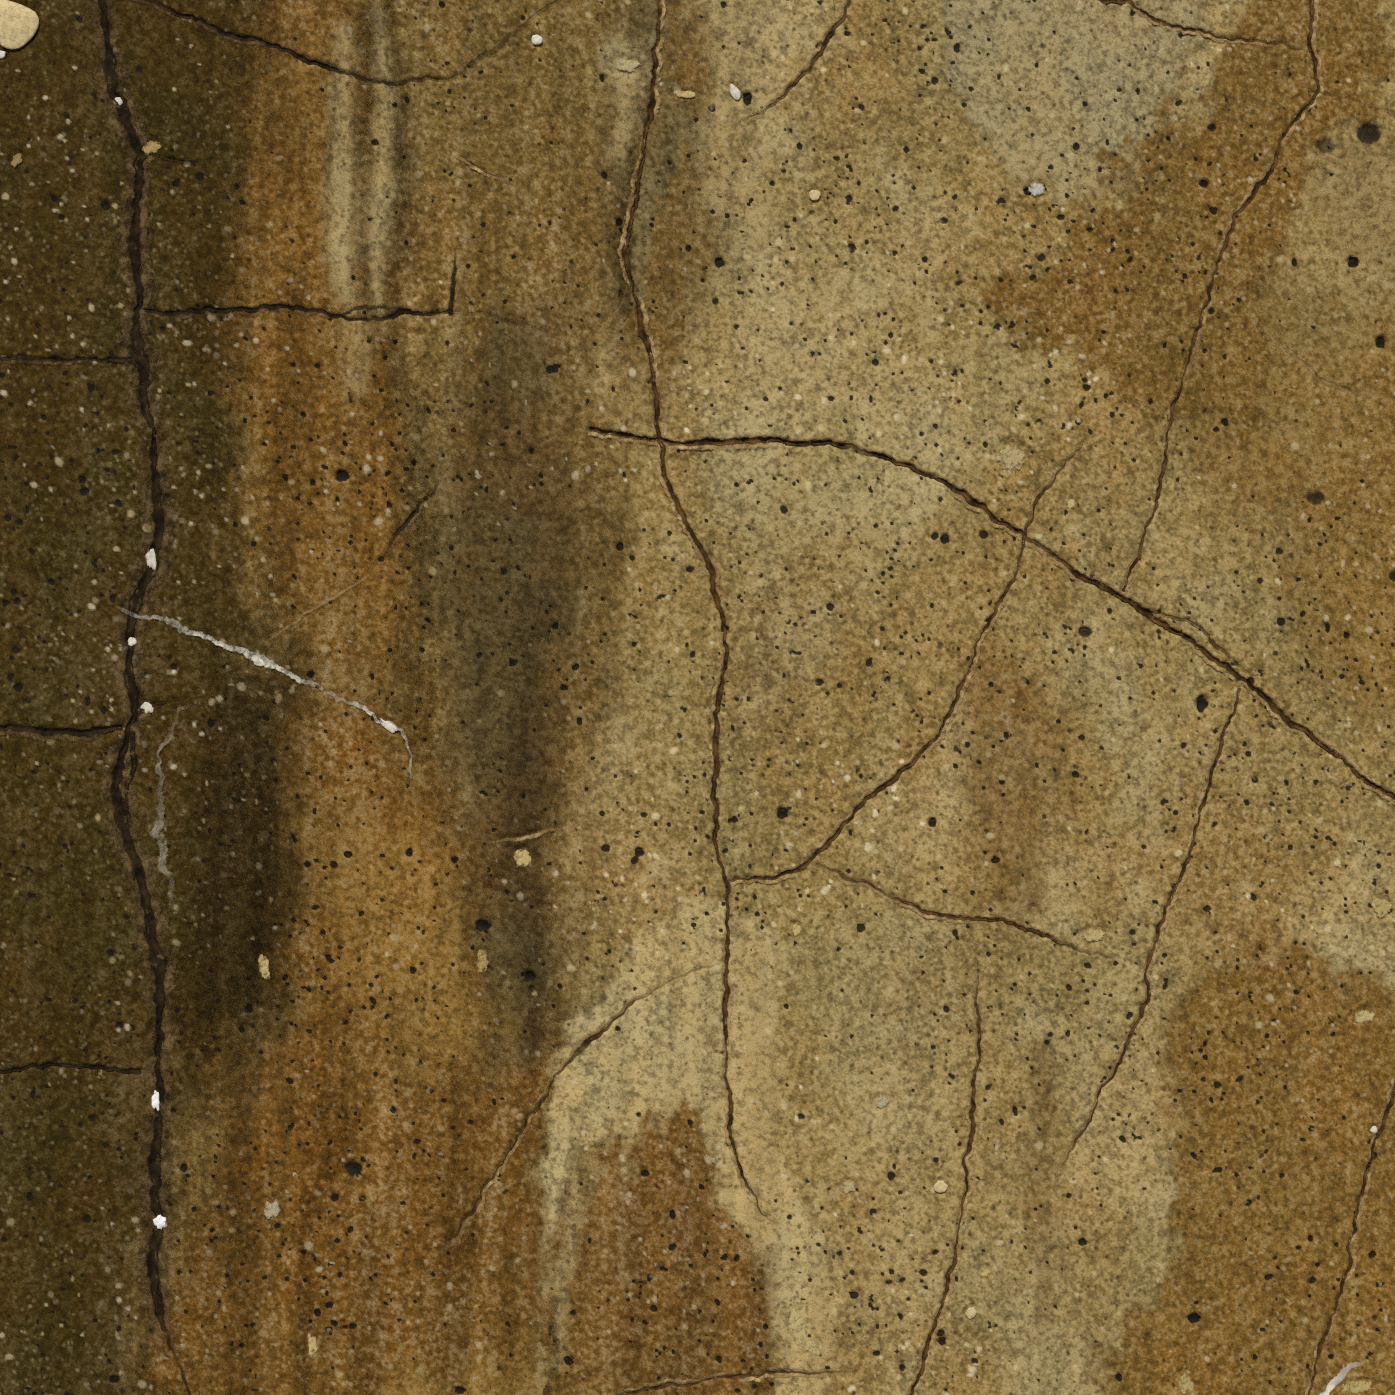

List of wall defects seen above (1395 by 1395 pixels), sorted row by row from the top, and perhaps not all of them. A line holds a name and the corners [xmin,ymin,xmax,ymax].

crack [0,0,457,1395]
damp [108,0,860,1395]
crack [502,826,551,841]
crack [588,0,1395,1211]
crack [457,994,646,1234]
crack [618,1370,829,1395]
crack [906,985,981,1395]
crack [1305,1077,1395,1395]